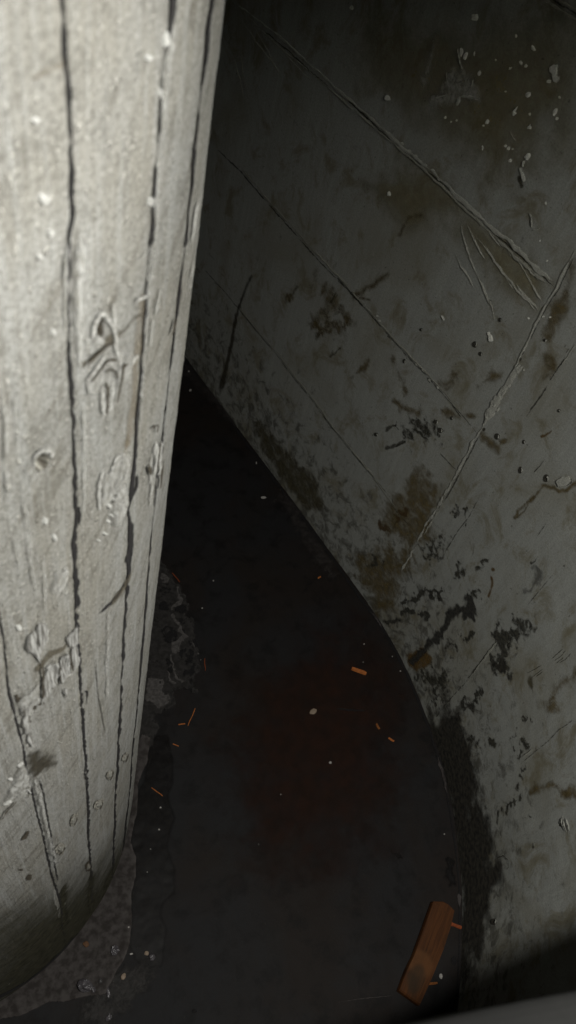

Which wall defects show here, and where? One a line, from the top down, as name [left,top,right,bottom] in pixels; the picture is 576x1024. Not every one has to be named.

peeling [15,624,80,747]
crack [62,0,497,1006]
crack [206,150,576,571]
leakage [384,587,576,981]